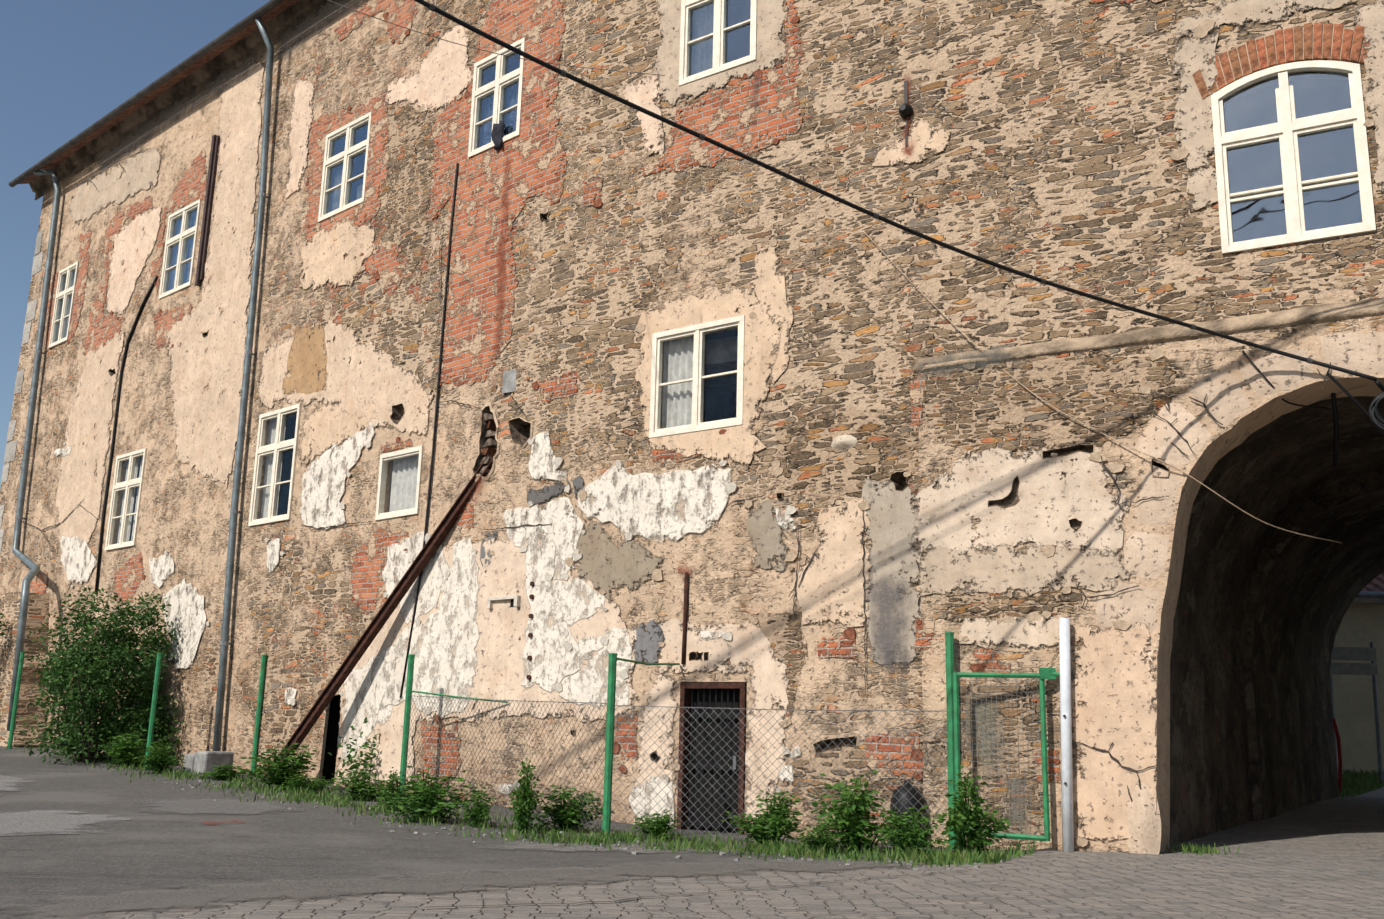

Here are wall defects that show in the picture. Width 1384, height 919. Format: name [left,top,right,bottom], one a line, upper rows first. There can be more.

flaking render [872,119,951,166]
flaking render [1169,0,1384,210]
spalling [259,0,567,530]
flaking render [29,60,264,594]
peeling [114,550,210,670]
peeling [265,538,285,572]
flaking render [336,238,1181,847]
peeling [284,688,297,706]
crack [1075,742,1155,806]